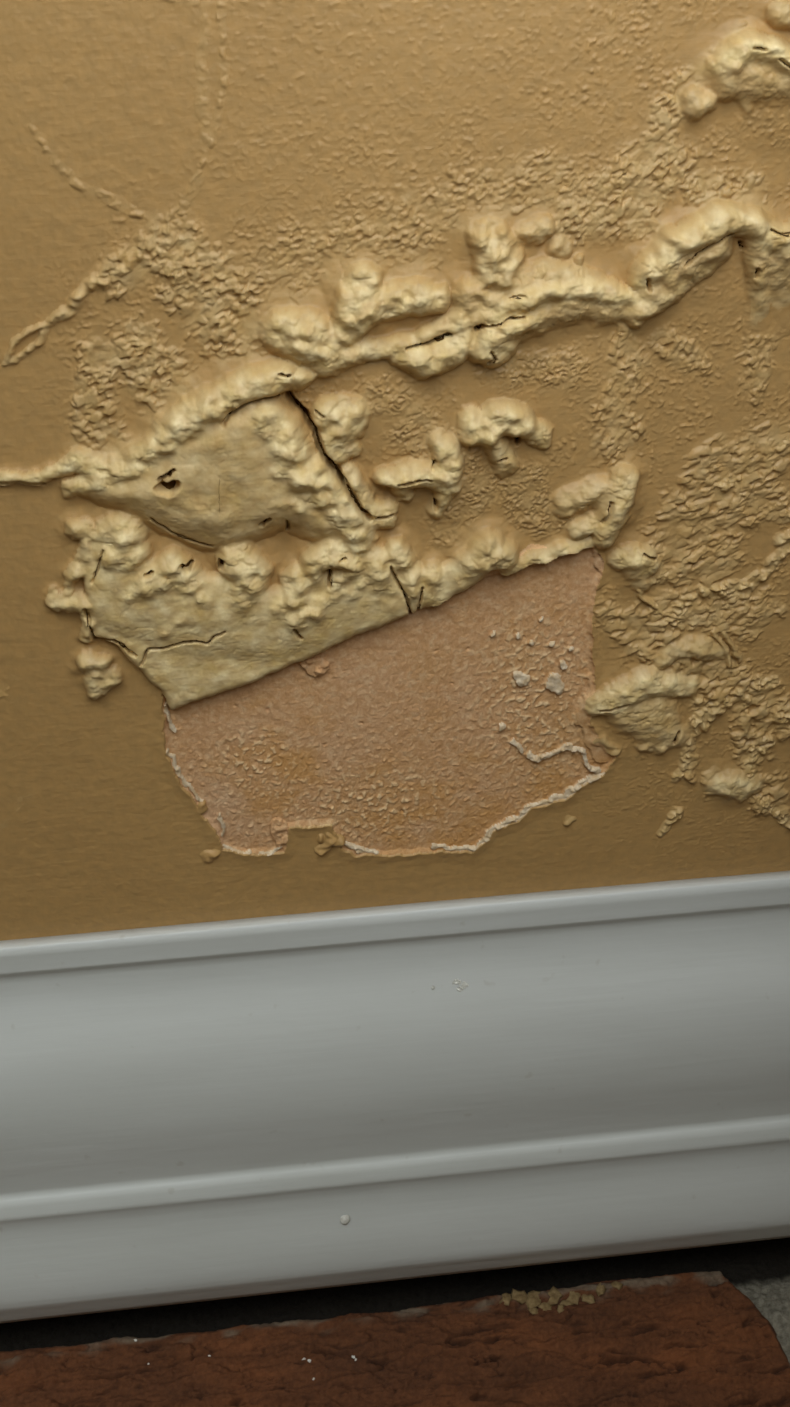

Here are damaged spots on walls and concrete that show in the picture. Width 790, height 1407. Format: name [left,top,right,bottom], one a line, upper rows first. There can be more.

spalling [46,510,729,863]